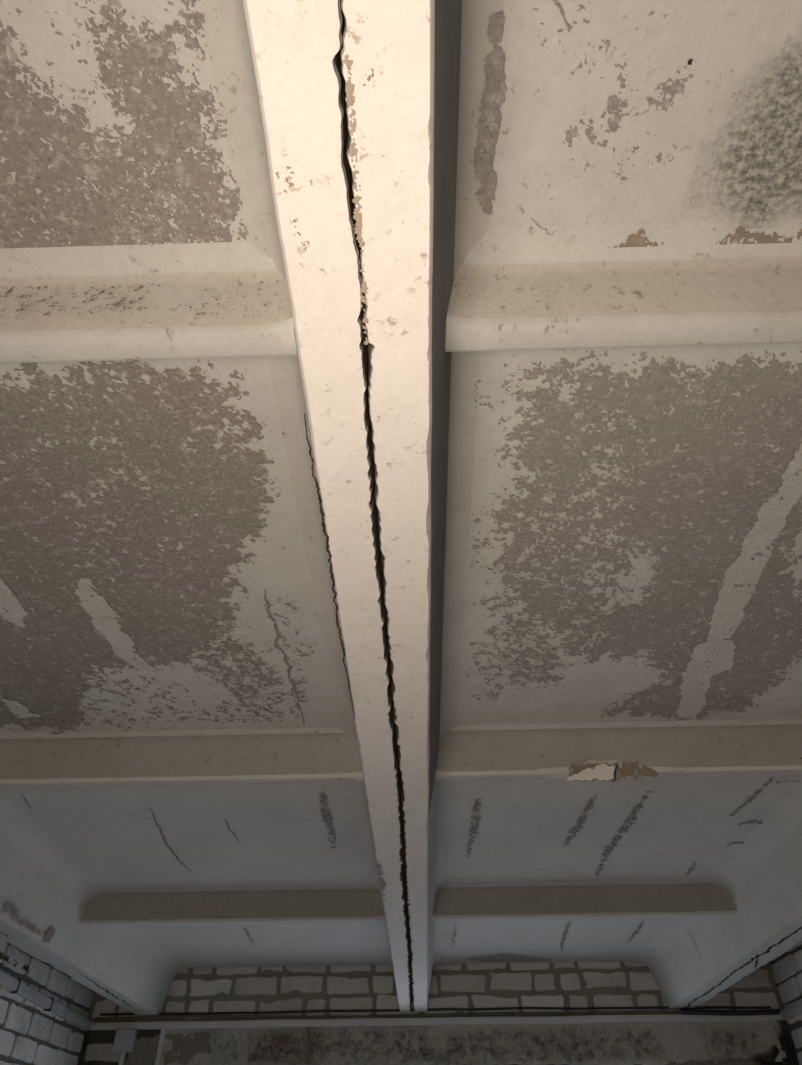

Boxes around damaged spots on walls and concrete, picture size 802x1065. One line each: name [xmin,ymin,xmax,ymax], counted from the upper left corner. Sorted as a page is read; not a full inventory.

peeling [0,0,249,249]
peeling [473,11,507,215]
spalling [608,229,664,248]
spalling [716,226,802,245]
mould [726,67,802,214]
peeling [0,360,318,734]
crack [264,590,305,724]
crack [304,413,355,718]
crack [333,0,415,1011]
peeling [465,344,802,723]
crack [466,798,483,857]
crack [684,927,802,1008]